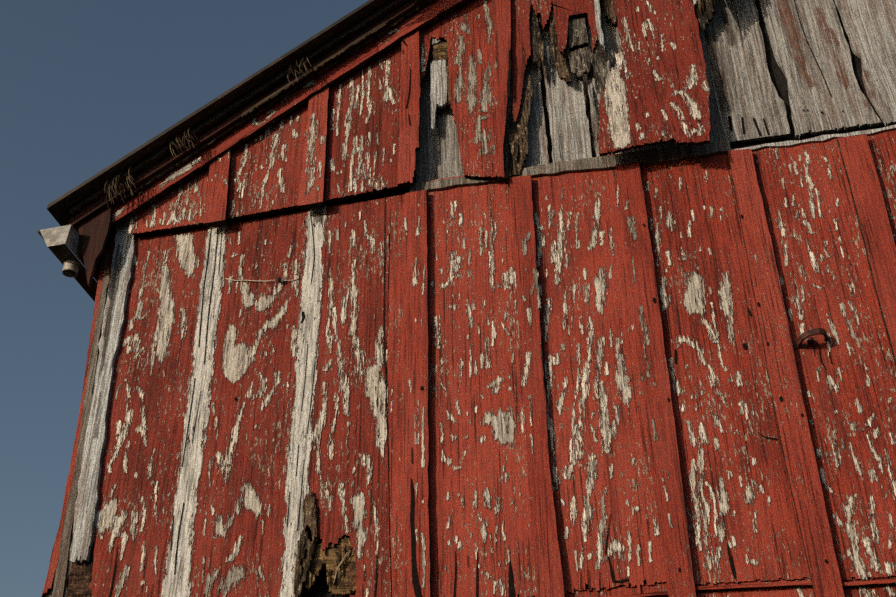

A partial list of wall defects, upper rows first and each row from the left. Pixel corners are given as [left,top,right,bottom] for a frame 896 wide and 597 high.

peeling [451,0,497,157]
peeling [602,0,710,150]
peeling [776,151,844,335]
peeling [95,56,396,597]
crack [382,208,390,470]
crack [410,447,422,597]
peeling [446,487,522,596]
peeling [412,184,673,577]
peeling [645,181,771,573]
peeling [826,273,871,387]
peeling [815,398,896,500]
peeling [829,493,896,597]